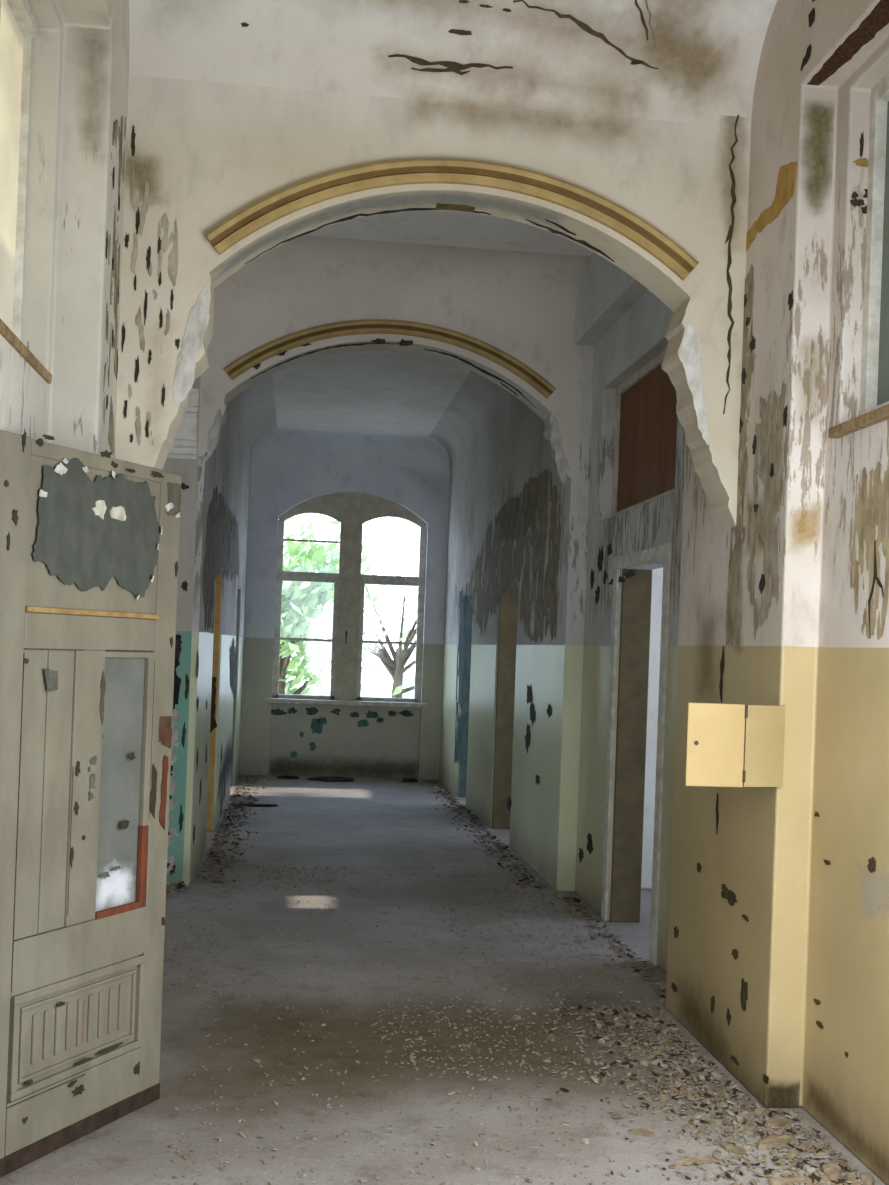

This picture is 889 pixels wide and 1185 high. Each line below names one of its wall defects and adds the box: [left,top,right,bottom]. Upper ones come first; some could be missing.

crack [388,54,513,75]
crack [513,0,658,69]
leakage [807,106,831,201]
crack [723,115,740,414]
peeling [33,115,208,600]
peeling [22,429,55,452]
peeling [726,264,787,648]
peeling [203,484,239,634]
peeling [850,462,889,640]
peeling [150,635,236,884]
peeling [271,707,414,758]
peeling [711,978,748,1026]